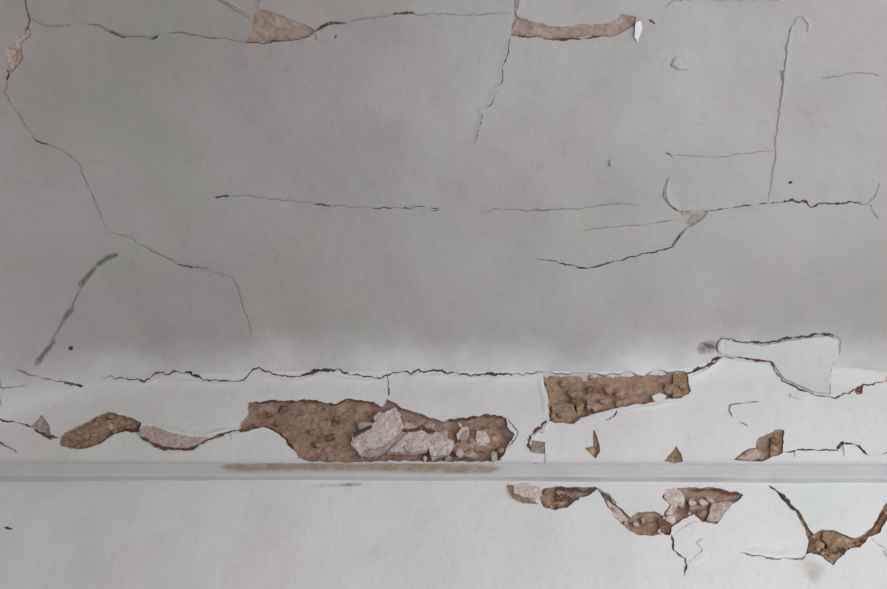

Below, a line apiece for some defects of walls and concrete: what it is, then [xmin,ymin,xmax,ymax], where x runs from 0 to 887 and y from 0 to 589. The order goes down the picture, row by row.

crack [347,11,512,23]
spalling [472,0,655,144]
crack [666,0,812,196]
crack [215,195,442,212]
crack [0,259,542,396]
crack [687,333,886,399]
spalling [0,398,515,463]
crack [508,420,549,464]
spalling [524,369,691,459]
spalling [734,429,869,462]
spalling [507,483,743,576]
spalling [741,485,887,565]